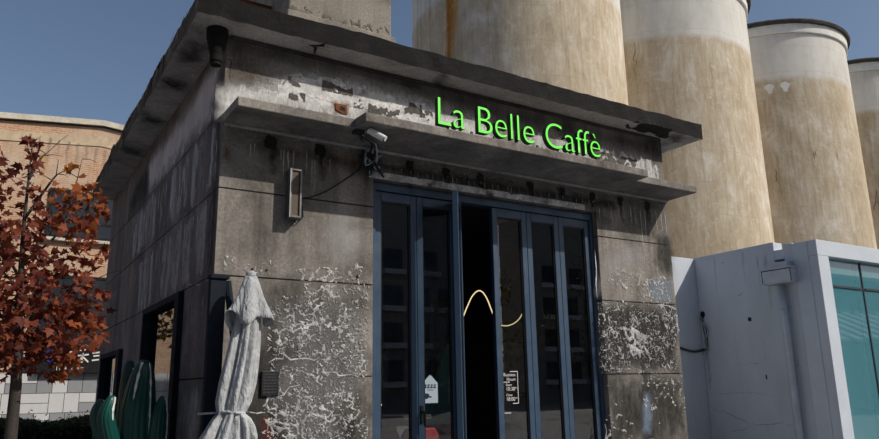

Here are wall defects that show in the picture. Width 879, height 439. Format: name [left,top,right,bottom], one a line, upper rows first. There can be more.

peeling [236,72,435,126]
damp [130,88,221,309]
damp [246,294,356,439]
damp [601,292,684,439]